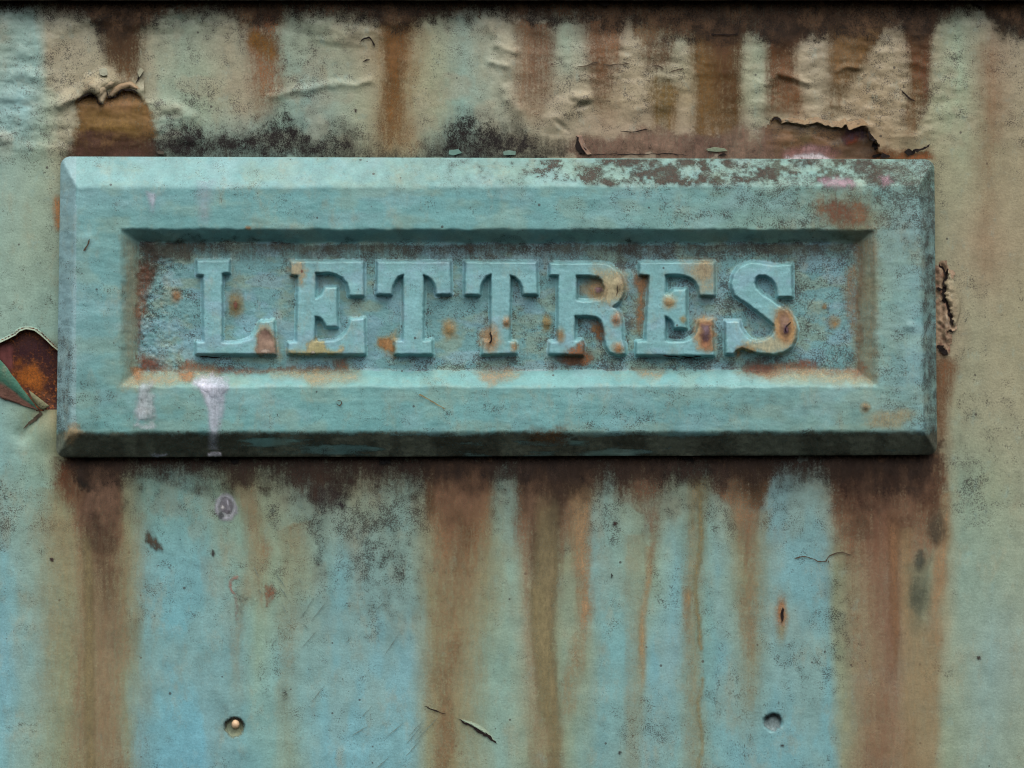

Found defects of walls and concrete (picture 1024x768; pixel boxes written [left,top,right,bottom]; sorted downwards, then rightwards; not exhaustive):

corrosion [67,8,163,157]
leakage [151,108,367,157]
corrosion [384,16,412,145]
peeling [763,116,932,159]
peeling [0,326,58,428]
corrosion [543,317,592,366]
corrosion [588,271,647,341]
peeling [935,261,960,356]
corrosion [51,457,130,768]
corrosion [712,456,771,632]
corrosion [831,454,949,721]